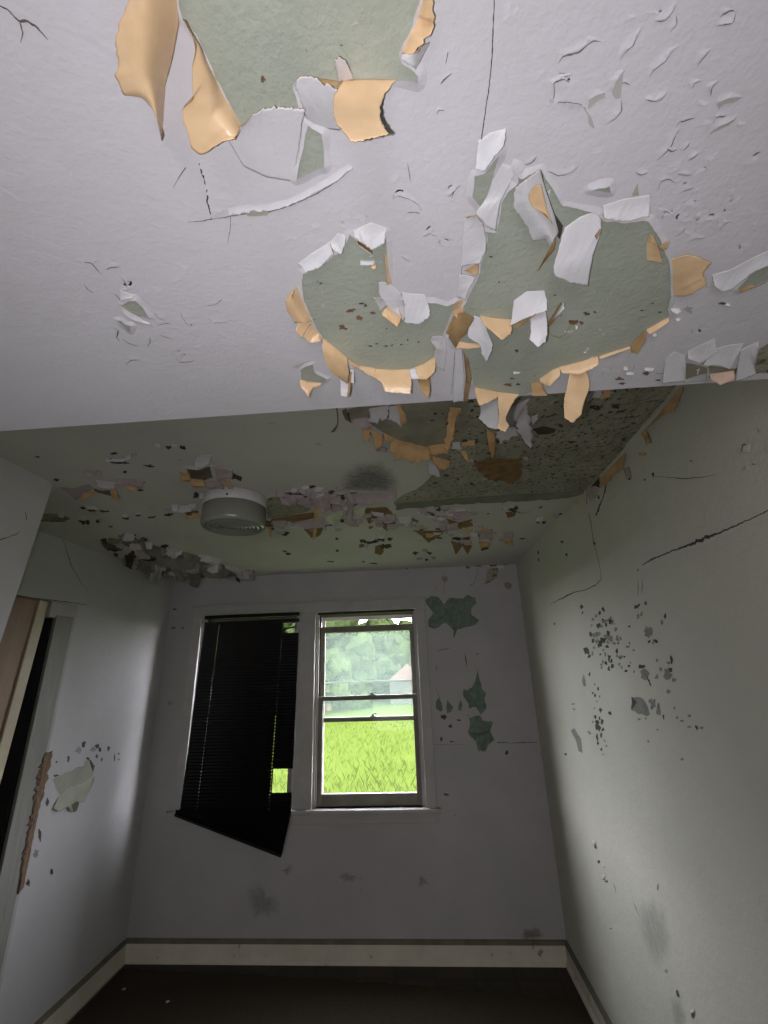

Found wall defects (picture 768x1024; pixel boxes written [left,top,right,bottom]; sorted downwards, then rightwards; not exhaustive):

peeling [114,0,435,220]
crack [481,0,495,140]
peeling [530,1,678,129]
peeling [265,48,768,569]
peeling [41,444,255,588]
crack [551,484,609,604]
crack [642,510,768,567]
peeling [424,594,480,638]
peeling [436,668,495,752]
flaking render [564,569,704,755]
peeling [45,741,120,812]